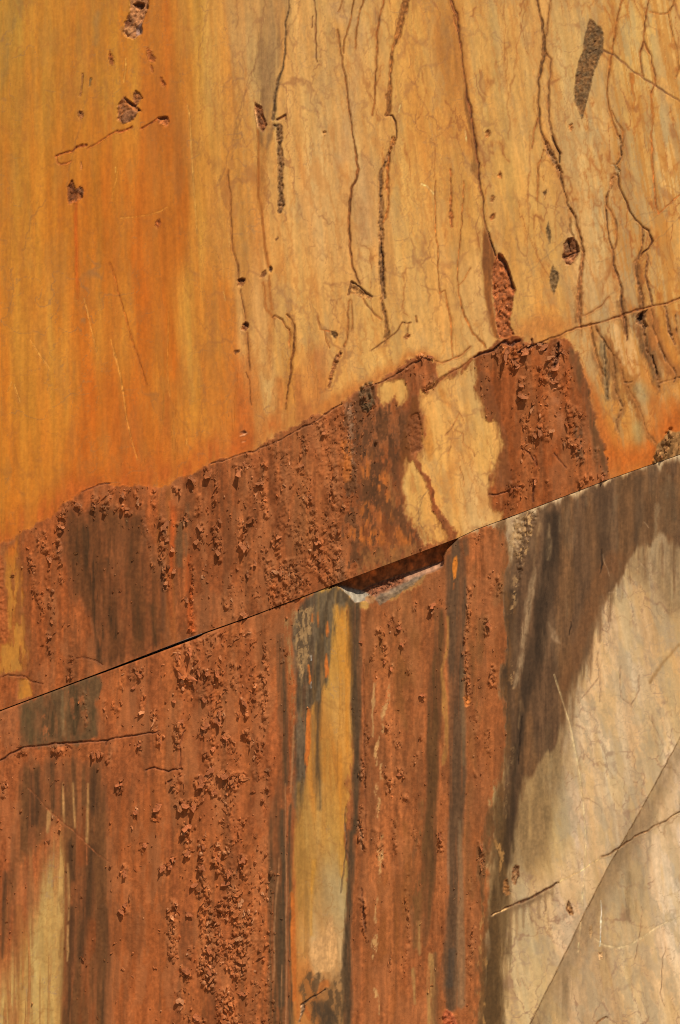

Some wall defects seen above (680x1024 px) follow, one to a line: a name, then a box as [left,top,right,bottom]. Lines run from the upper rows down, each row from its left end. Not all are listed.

spalling [117,90,143,124]
spalling [122,0,149,39]
corrosion [0,129,504,646]
crack [210,0,680,465]
crack [444,413,566,502]
spalling [549,236,580,294]
spalling [568,19,604,132]
water stain [0,502,169,1024]
crack [0,730,185,783]
corrosion [288,606,354,1021]
water stain [410,346,680,1024]
crack [489,651,680,1024]